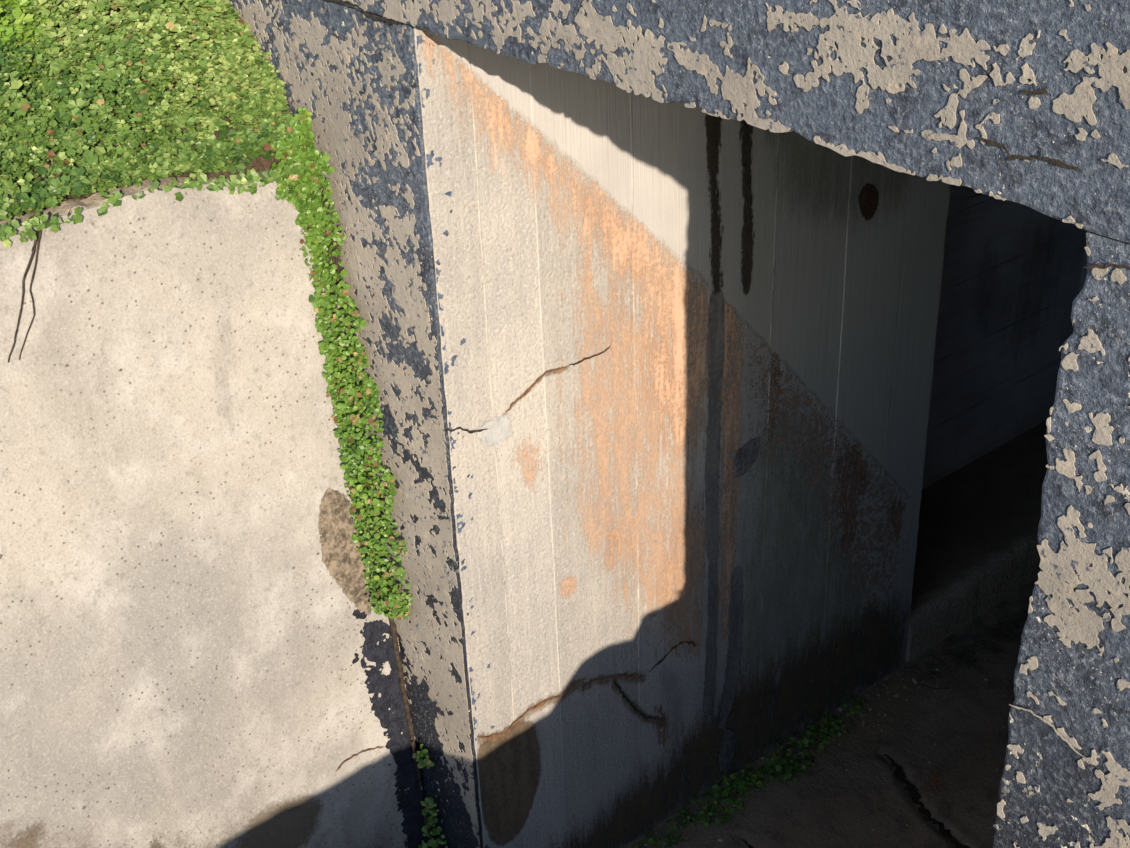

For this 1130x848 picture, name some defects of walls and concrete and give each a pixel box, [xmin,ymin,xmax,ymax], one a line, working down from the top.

peeling [765,0,1130,186]
damp [705,114,724,296]
corrosion [859,184,878,220]
peeling [230,0,790,848]
crack [443,346,611,434]
corrosion [424,34,743,655]
peeling [1028,506,1130,663]
damp [227,797,320,848]
damp [477,721,541,845]
crack [477,641,699,742]
crack [884,754,969,848]
peeling [1027,691,1130,848]